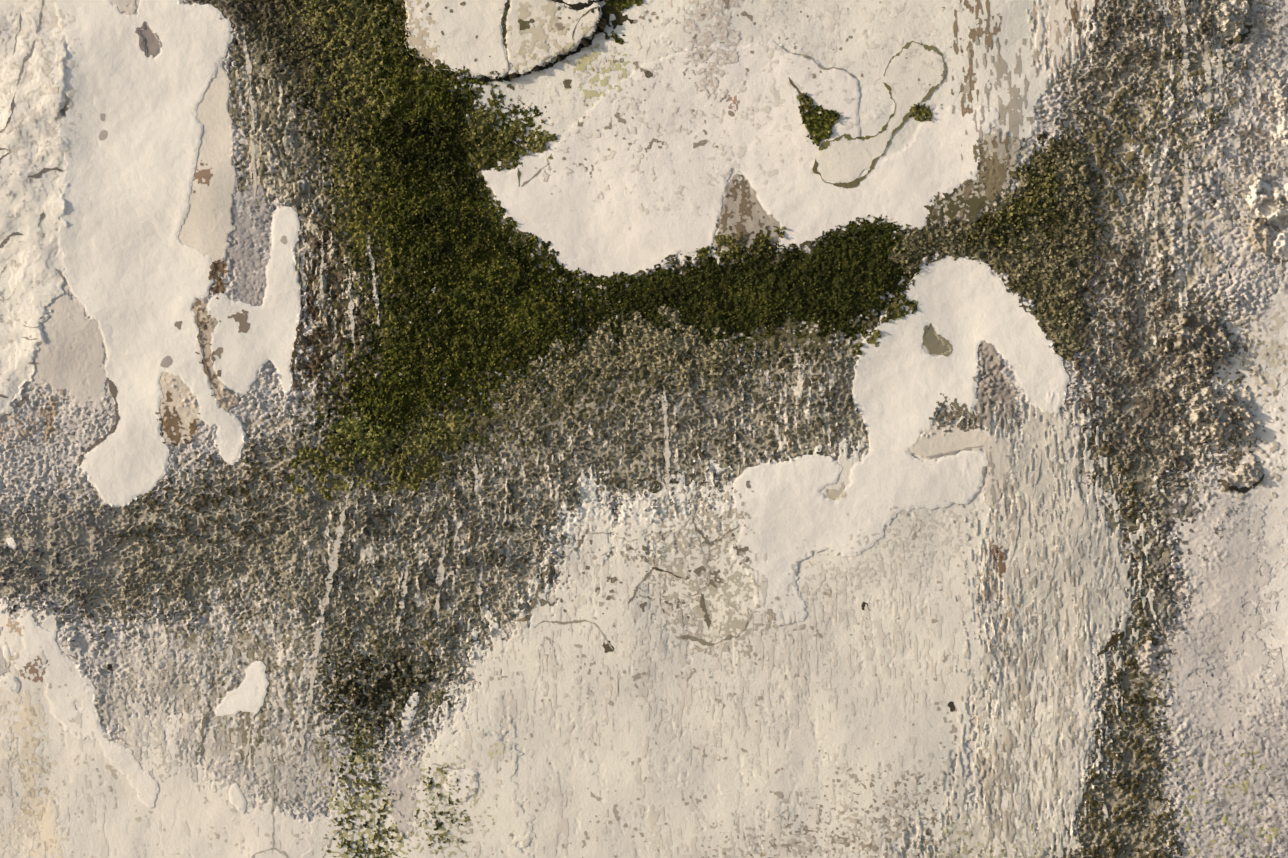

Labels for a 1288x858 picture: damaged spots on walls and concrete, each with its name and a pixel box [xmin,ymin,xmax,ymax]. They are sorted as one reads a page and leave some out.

peeling [0,0,111,424]
damp [225,182,272,306]
peeling [178,41,387,388]
damp [290,85,410,423]
crack [468,0,607,82]
spalling [676,170,797,263]
damp [716,175,764,248]
peeling [472,0,1106,238]
damp [931,136,1011,217]
peeling [1113,0,1288,345]
peeling [0,266,1288,858]
damp [485,472,1093,858]